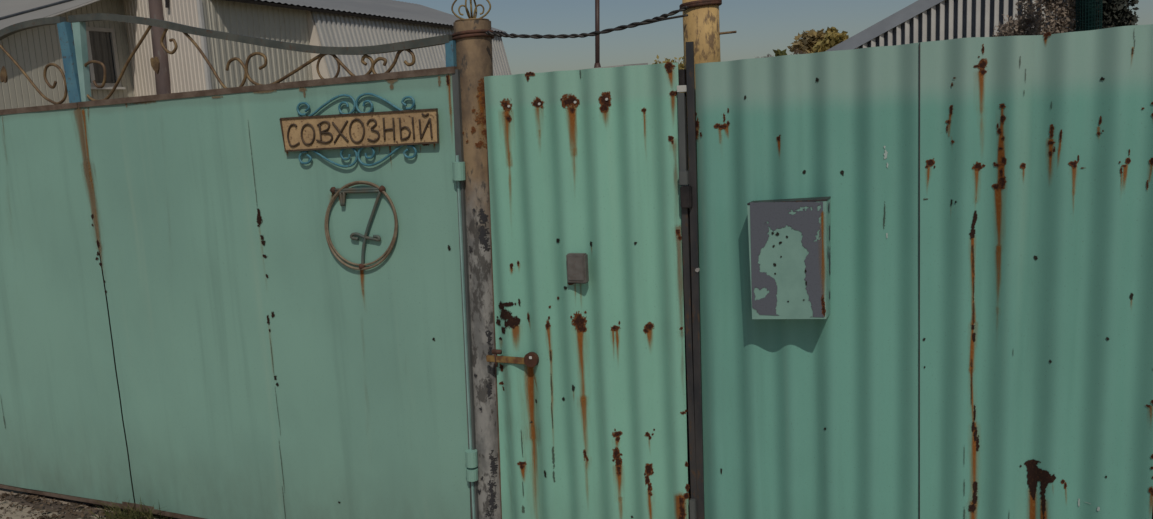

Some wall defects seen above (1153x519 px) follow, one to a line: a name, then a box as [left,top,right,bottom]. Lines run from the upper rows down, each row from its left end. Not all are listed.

corrosion [462,78,487,148]
corrosion [500,98,512,182]
corrosion [560,94,580,154]
corrosion [598,91,611,120]
corrosion [974,44,988,105]
corrosion [1048,124,1084,192]
corrosion [972,103,1007,291]
corrosion [643,322,654,344]
corrosion [570,311,589,461]
corrosion [517,365,537,489]
corrosion [612,429,623,511]
corrosion [644,463,654,519]